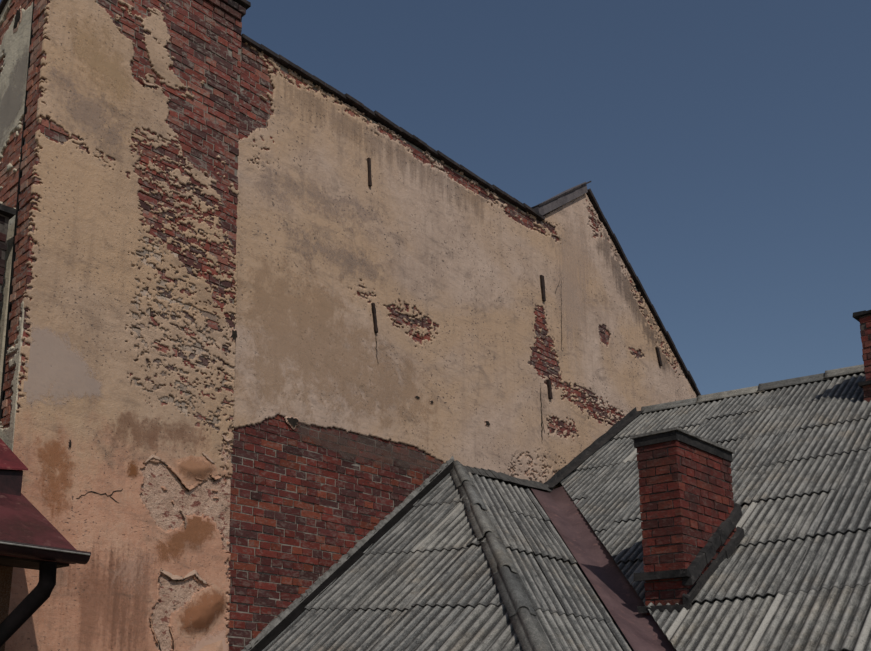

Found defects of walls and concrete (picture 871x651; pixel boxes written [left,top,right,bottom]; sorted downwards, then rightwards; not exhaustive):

flaking render [0,0,565,651]
spalling [528,305,625,426]
spalling [546,415,579,438]
crack [79,490,122,503]